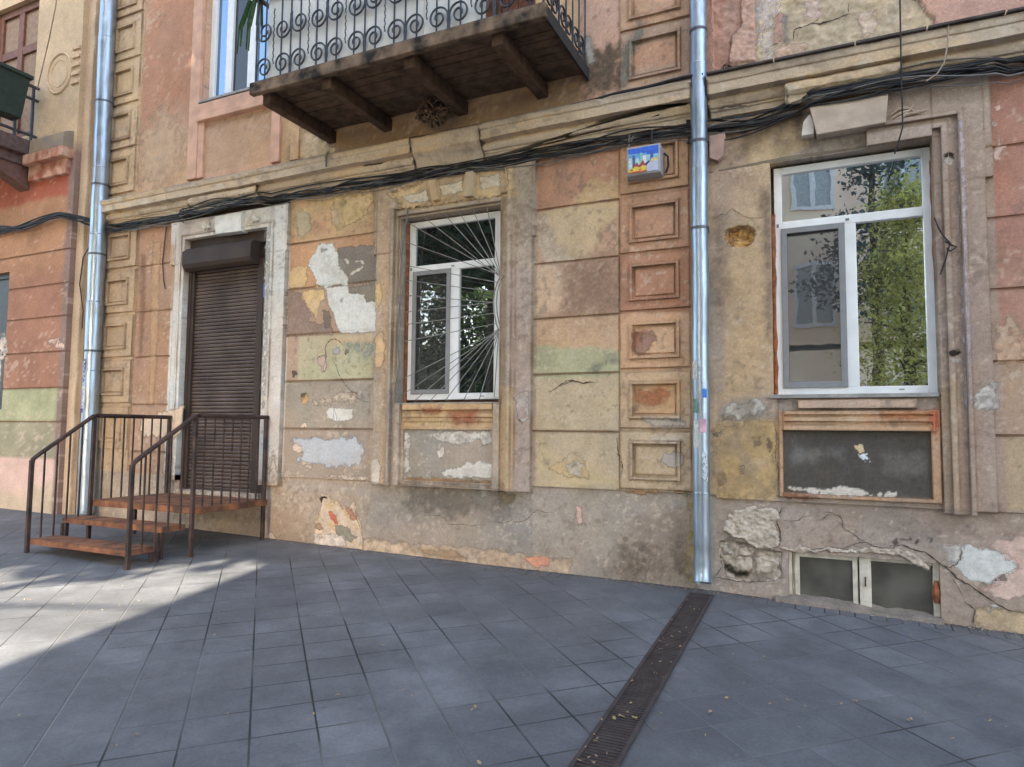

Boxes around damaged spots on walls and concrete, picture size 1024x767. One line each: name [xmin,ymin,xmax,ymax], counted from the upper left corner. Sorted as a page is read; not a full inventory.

spalling [710,0,934,69]
spalling [725,219,756,248]
peeling [944,120,1000,411]
peeling [284,243,386,372]
peeling [292,423,381,484]
peeling [313,493,572,574]
peeling [433,430,492,458]
peeling [441,461,492,479]
spalling [712,398,931,583]
crack [774,424,1016,623]
peeling [940,534,1024,634]